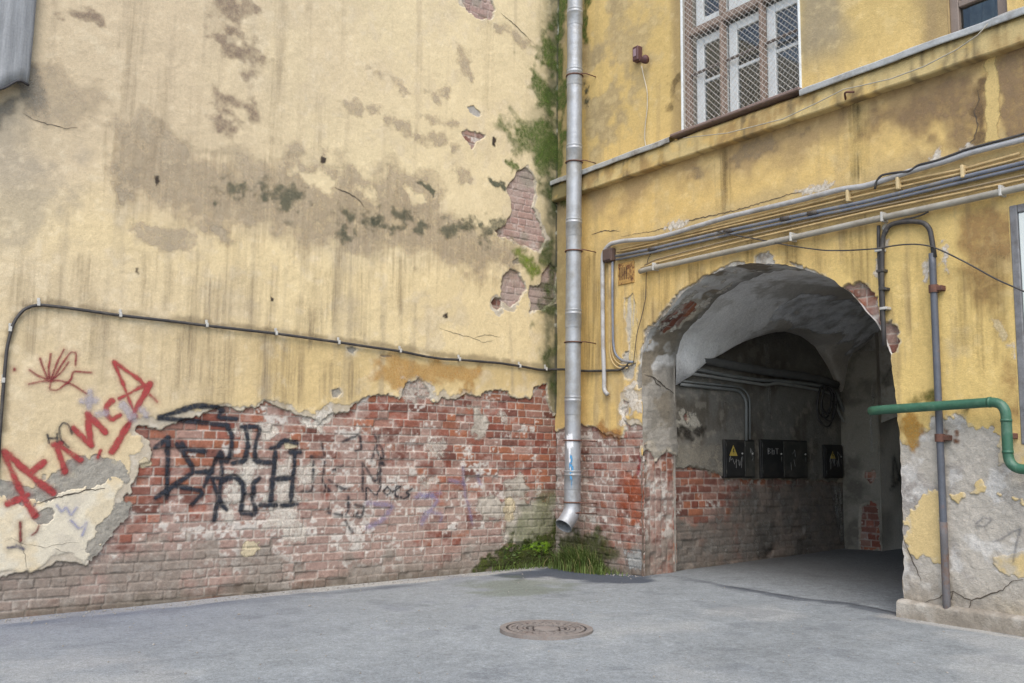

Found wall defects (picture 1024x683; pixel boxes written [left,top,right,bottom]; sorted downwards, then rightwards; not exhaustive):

leakage [216,0,264,61]
flaking render [462,0,526,48]
peeling [345,101,496,152]
peeling [115,115,556,311]
peeling [771,259,900,354]
flaking render [0,378,845,619]
flaking render [900,413,1024,616]
crack [903,537,1023,607]